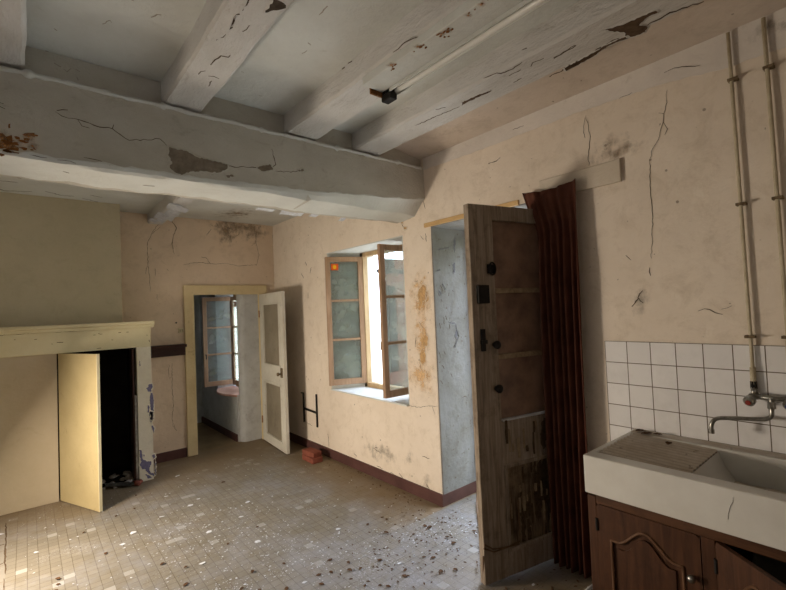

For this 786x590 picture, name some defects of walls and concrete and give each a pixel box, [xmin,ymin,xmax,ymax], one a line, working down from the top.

spalling [263,0,289,14]
rust [0,124,38,157]
crack [55,109,167,146]
spalling [166,146,236,180]
crack [649,92,668,253]
peeling [415,322,429,378]
peeling [145,383,155,433]
peeling [138,448,157,480]
crack [0,525,8,590]